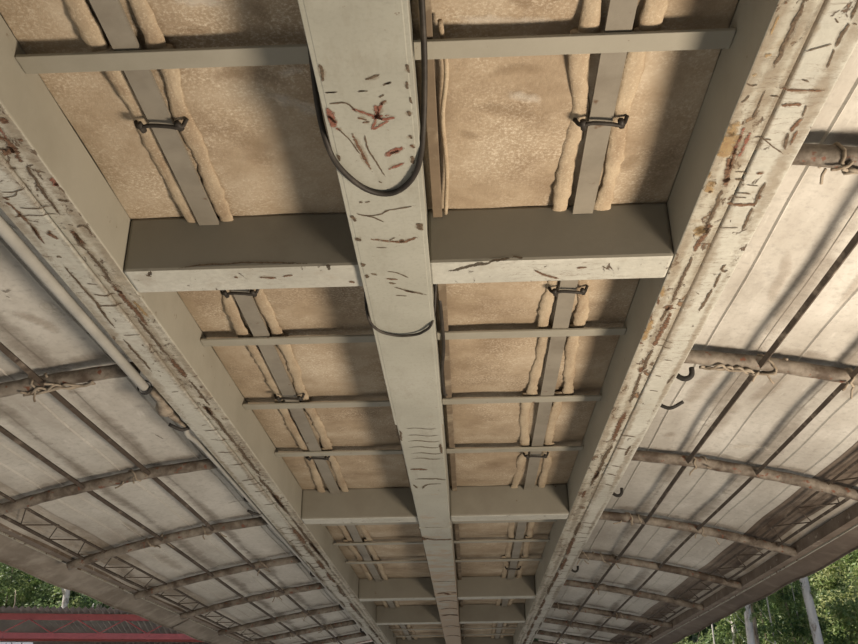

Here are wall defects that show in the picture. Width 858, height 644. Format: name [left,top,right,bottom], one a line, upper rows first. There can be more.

peeling [826,1,858,68]
corrosion [326,109,339,130]
crack [326,82,389,112]
corrosion [358,100,395,130]
peeling [784,105,807,149]
peeling [26,166,59,214]
crack [338,129,426,296]
peeling [742,183,766,230]
peeling [57,257,122,328]
peeling [697,265,728,311]
crack [399,431,443,460]